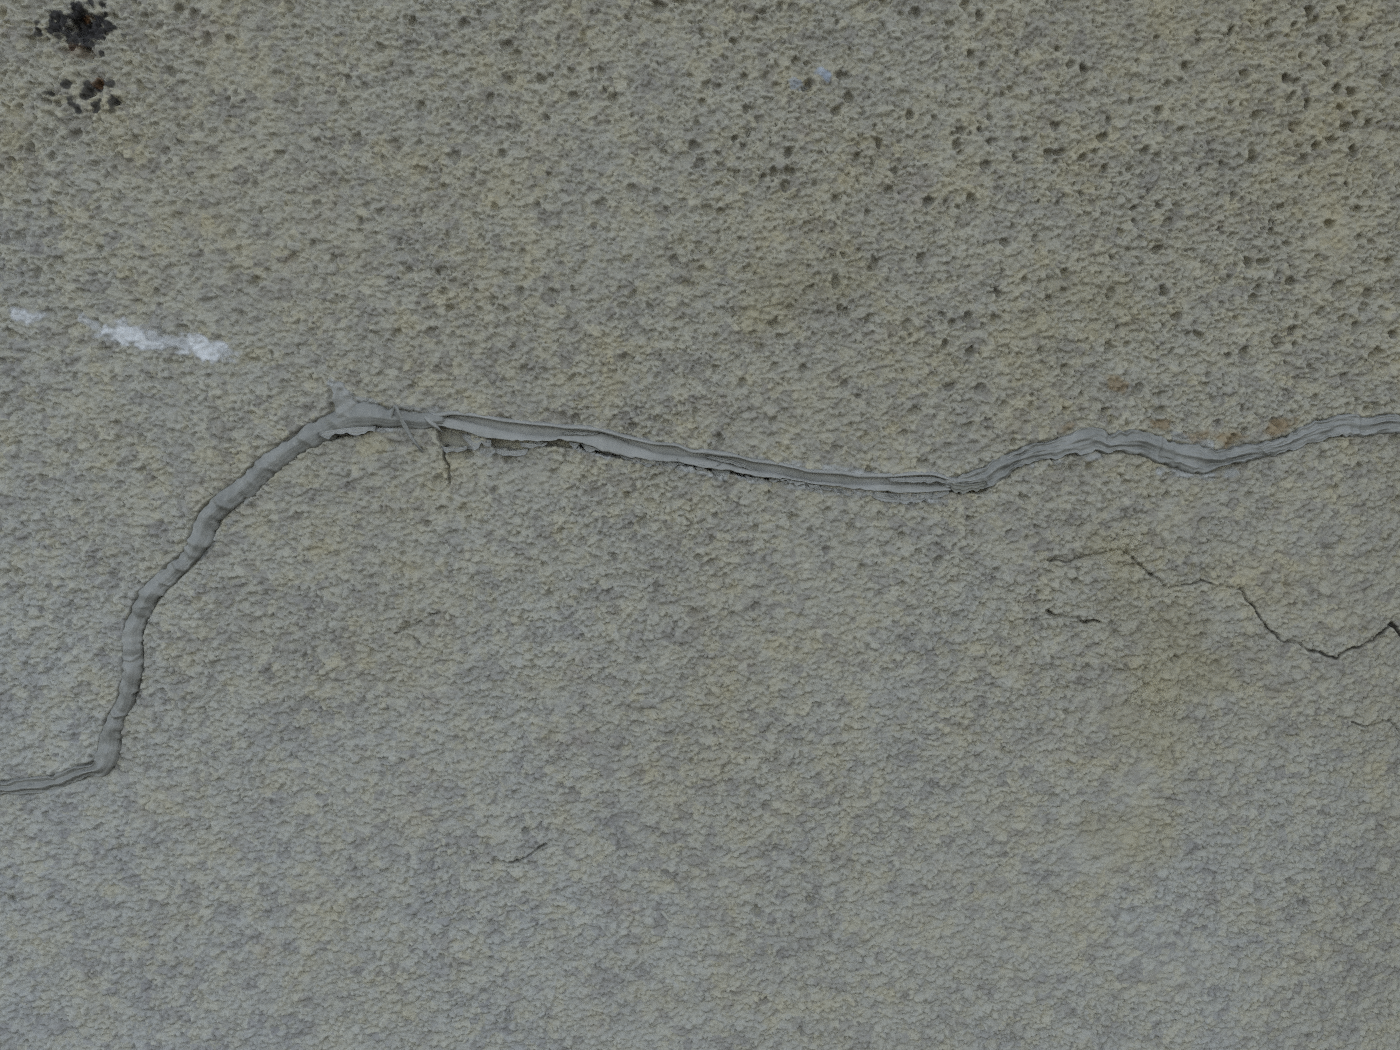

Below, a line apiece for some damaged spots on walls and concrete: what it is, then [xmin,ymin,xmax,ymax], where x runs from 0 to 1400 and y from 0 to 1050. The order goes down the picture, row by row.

crack [0,378,1400,801]